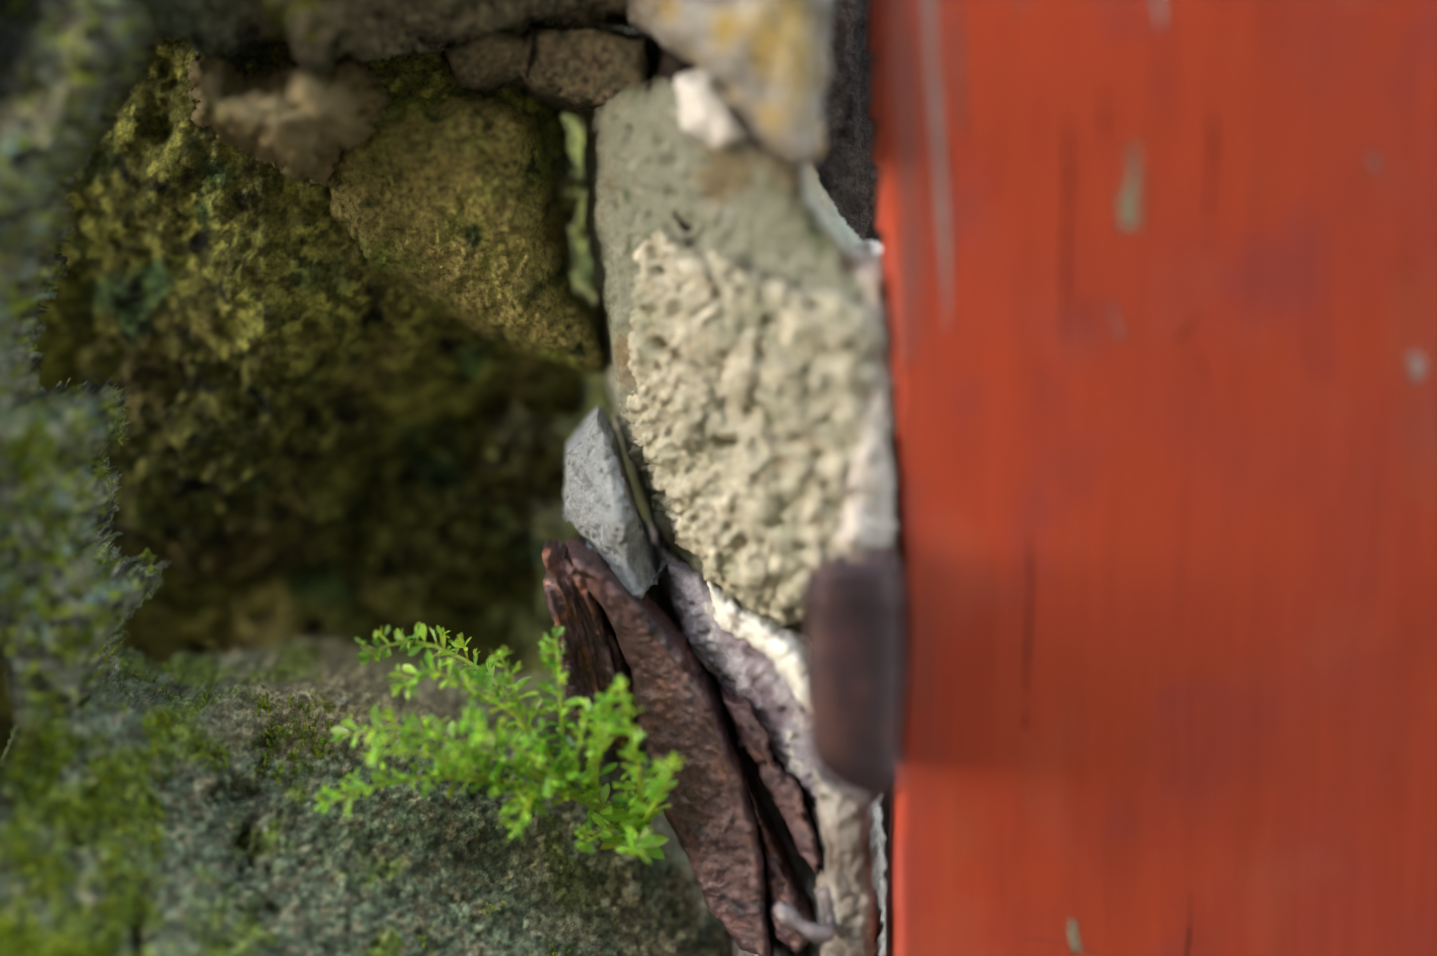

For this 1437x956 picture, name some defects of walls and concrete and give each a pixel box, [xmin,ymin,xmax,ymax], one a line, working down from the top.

peeling [1118,147,1139,229]